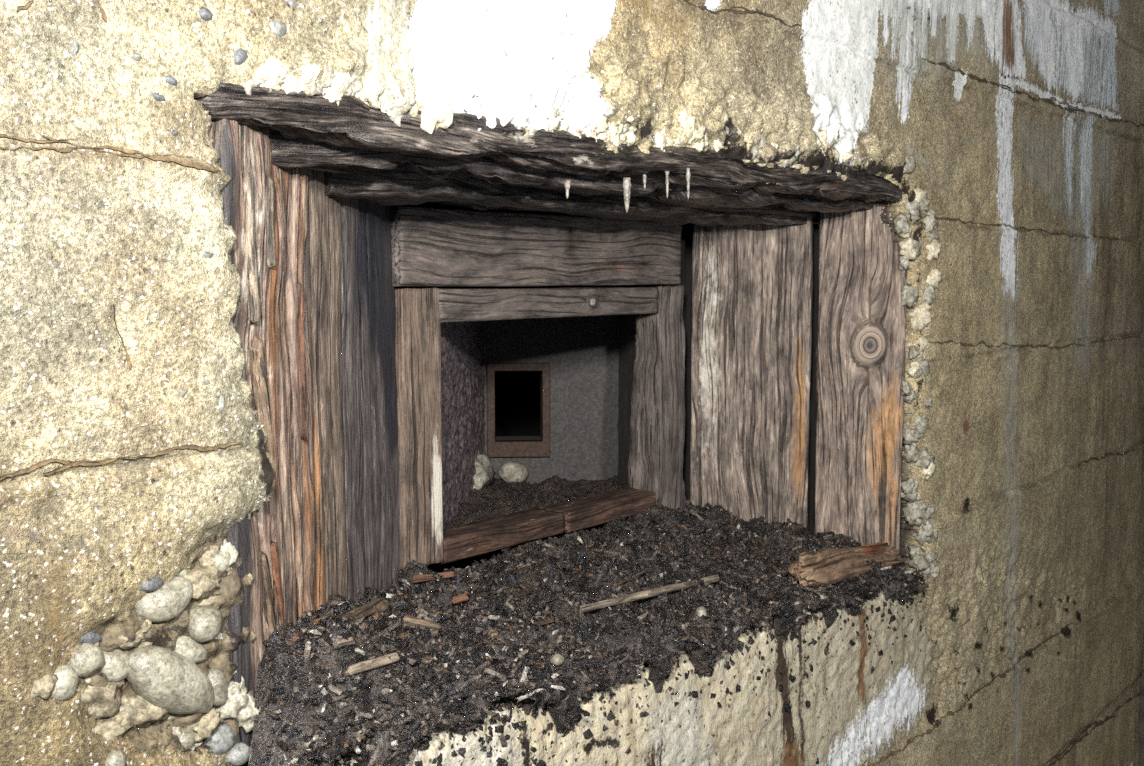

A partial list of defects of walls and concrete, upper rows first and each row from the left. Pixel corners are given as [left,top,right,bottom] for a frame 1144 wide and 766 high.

crack [685,0,801,27]
crack [0,132,221,172]
water stain [619,117,654,155]
water stain [707,0,1121,760]
water stain [411,590,933,766]
crack [867,622,1072,766]
crack [1049,694,1141,766]